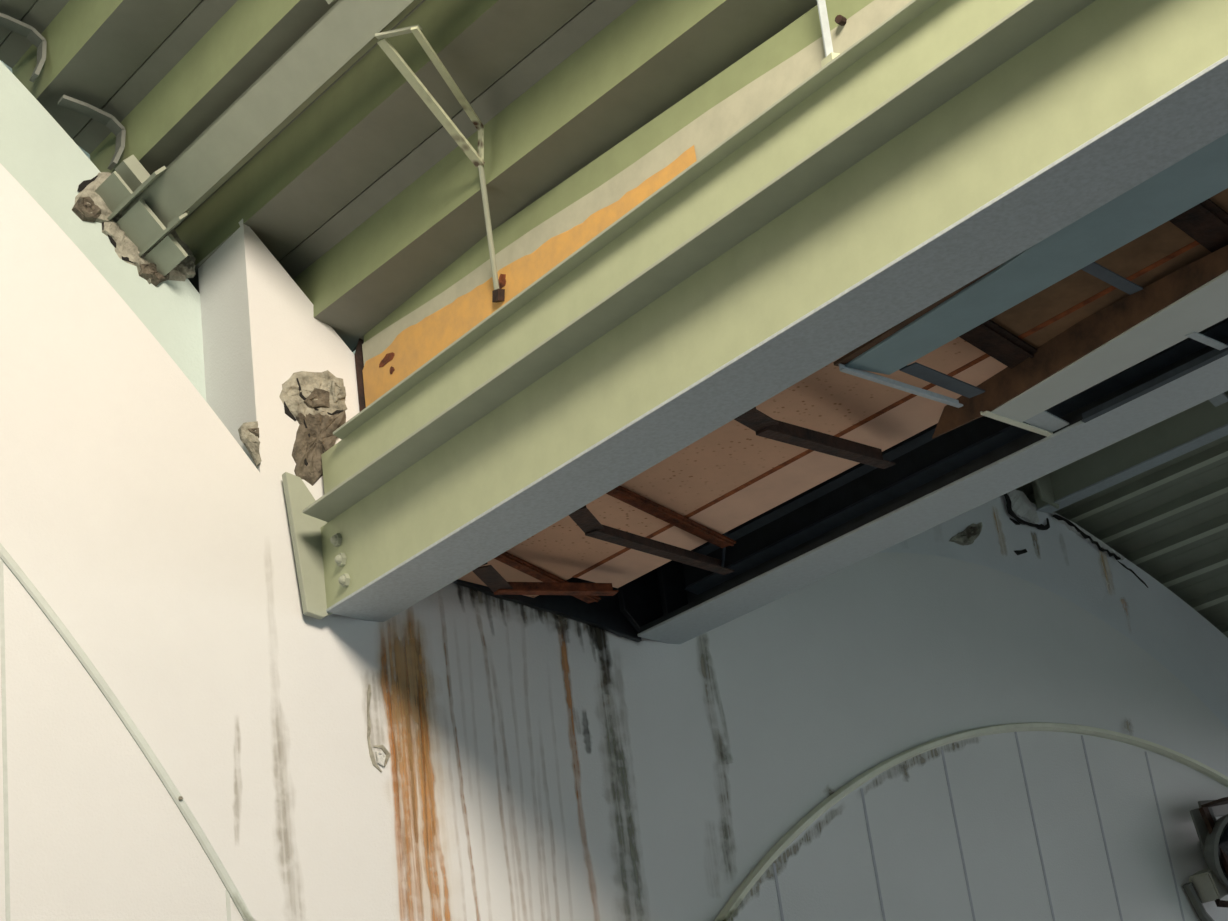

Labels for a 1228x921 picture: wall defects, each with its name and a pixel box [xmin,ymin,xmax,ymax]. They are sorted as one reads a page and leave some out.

spalling [72,171,196,286]
spalling [279,370,347,486]
spalling [949,522,982,546]
crack [1004,493,1148,588]
rust [559,616,577,767]
damp [591,626,611,688]
rust [381,623,450,921]
damp [608,728,640,907]